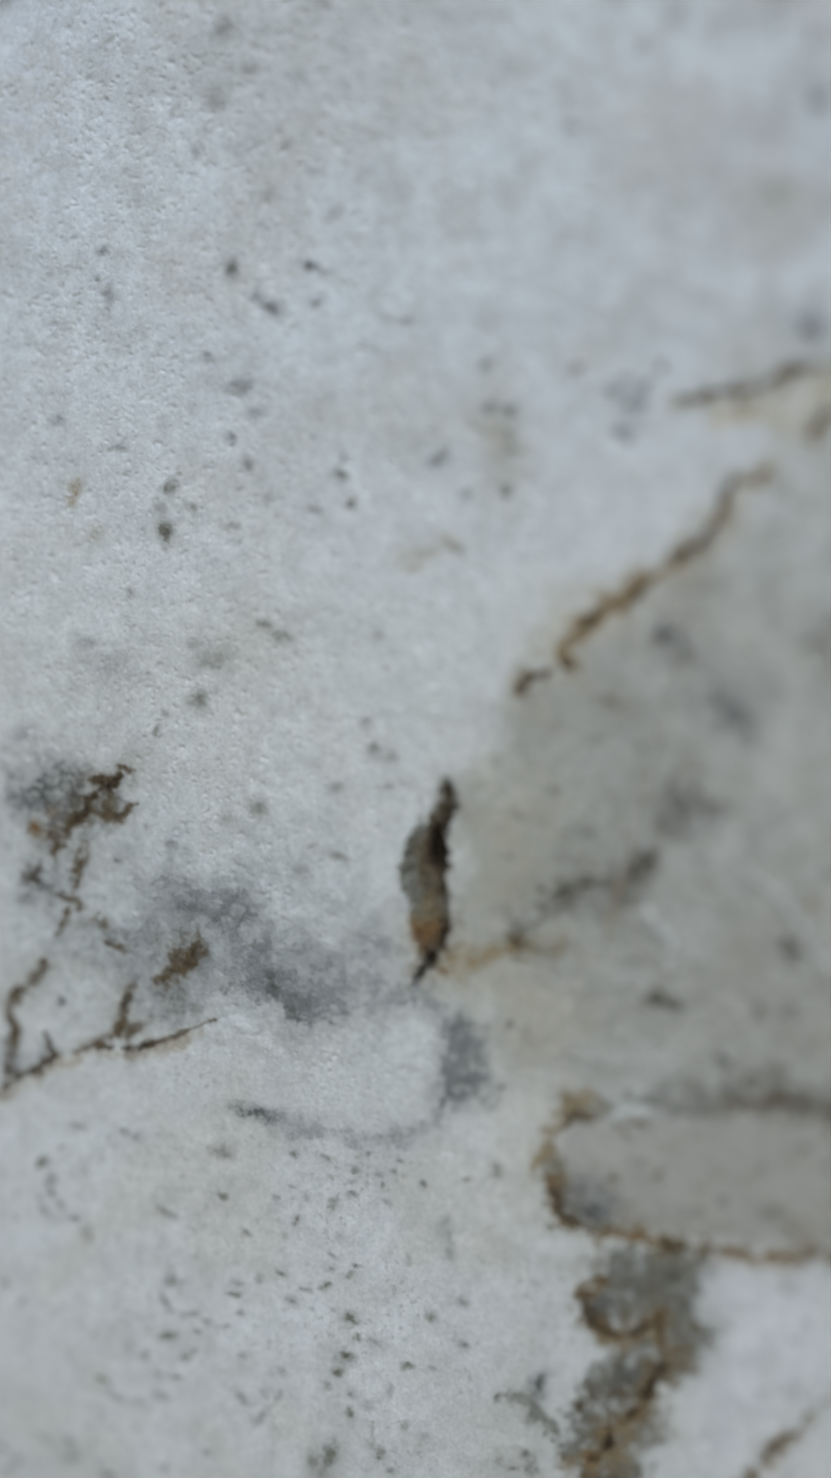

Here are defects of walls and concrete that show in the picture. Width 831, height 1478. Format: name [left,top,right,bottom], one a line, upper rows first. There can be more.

crack [680,364,827,405]
crack [516,469,770,694]
crack [1,958,216,1090]
water stain [7,761,504,1109]
spalling [398,777,458,989]
crack [506,773,725,953]
rust [542,1157,831,1478]
crack [745,1413,811,1478]